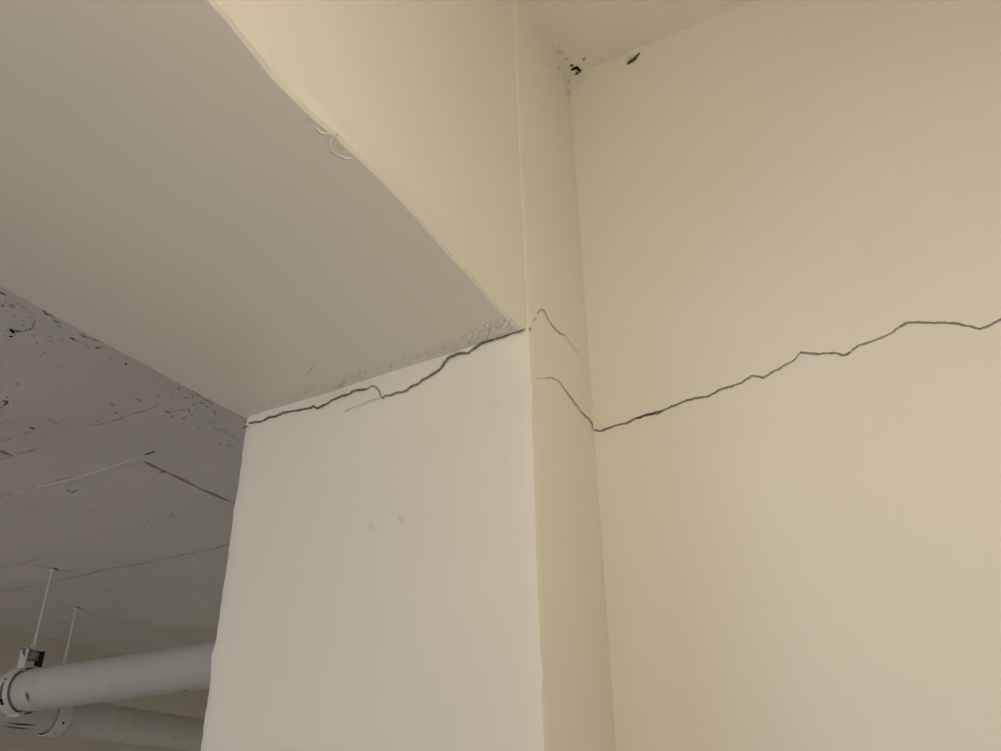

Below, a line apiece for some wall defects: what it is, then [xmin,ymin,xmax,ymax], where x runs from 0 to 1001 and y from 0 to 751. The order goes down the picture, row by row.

crack [243,312,539,428]
crack [588,319,1001,432]